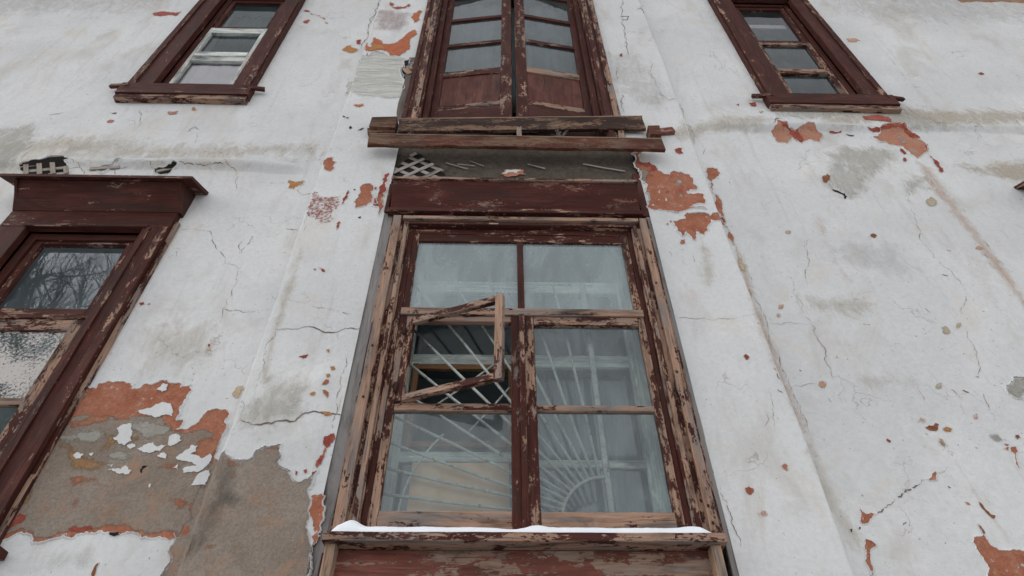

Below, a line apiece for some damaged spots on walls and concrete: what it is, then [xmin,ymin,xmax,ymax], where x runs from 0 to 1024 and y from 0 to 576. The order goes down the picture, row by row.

peeling [341,2,421,82]
peeling [769,112,943,199]
peeling [307,172,391,230]
peeling [631,152,746,271]
crack [181,229,359,373]
crack [679,251,833,425]
crack [241,358,347,427]
peeling [1,379,335,576]
crack [878,467,947,513]
peeling [966,502,1024,576]